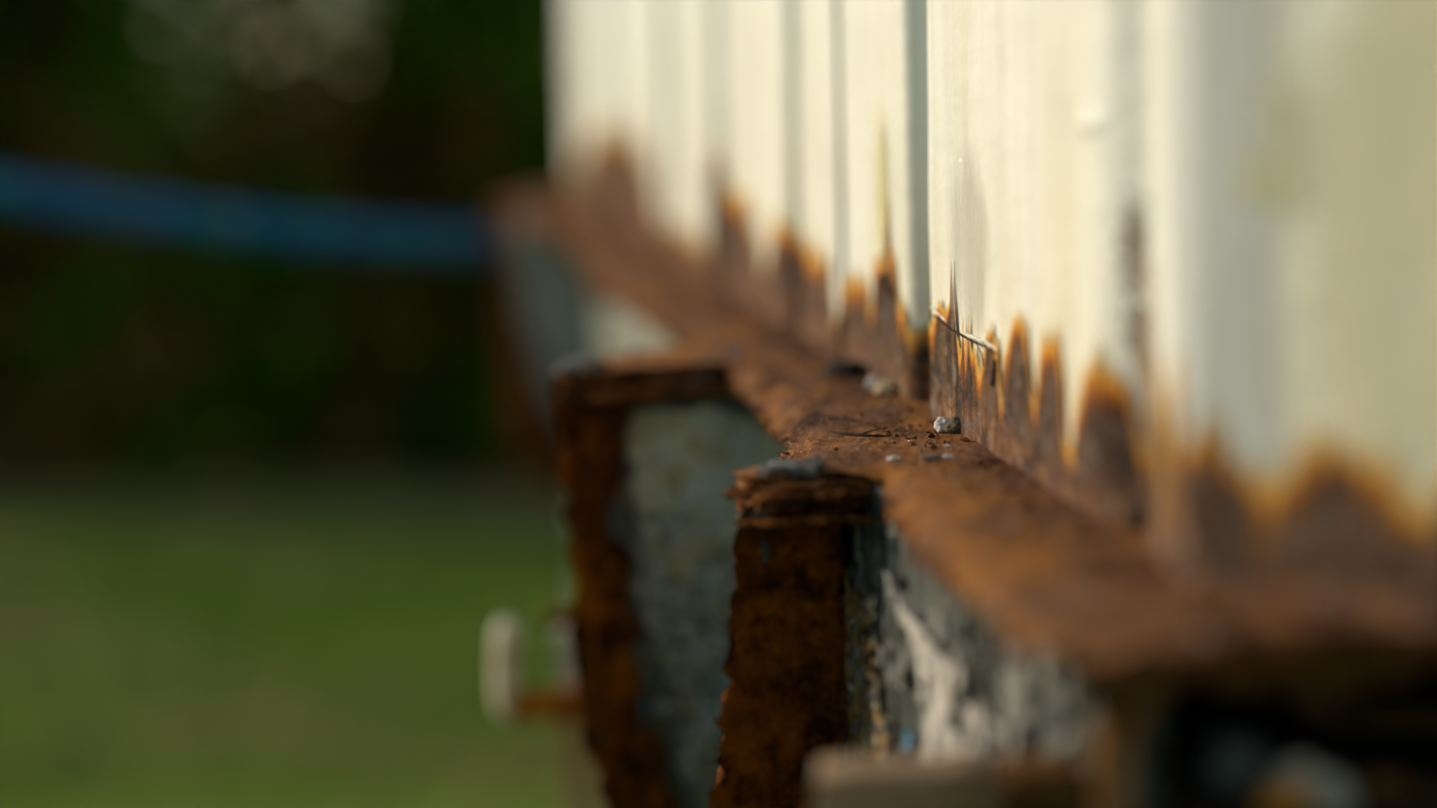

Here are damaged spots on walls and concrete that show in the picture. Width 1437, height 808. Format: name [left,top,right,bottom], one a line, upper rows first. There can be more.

corrosion [553,354,610,373]
corrosion [573,100,1437,624]
peeling [625,402,786,808]
peeling [871,572,1078,756]